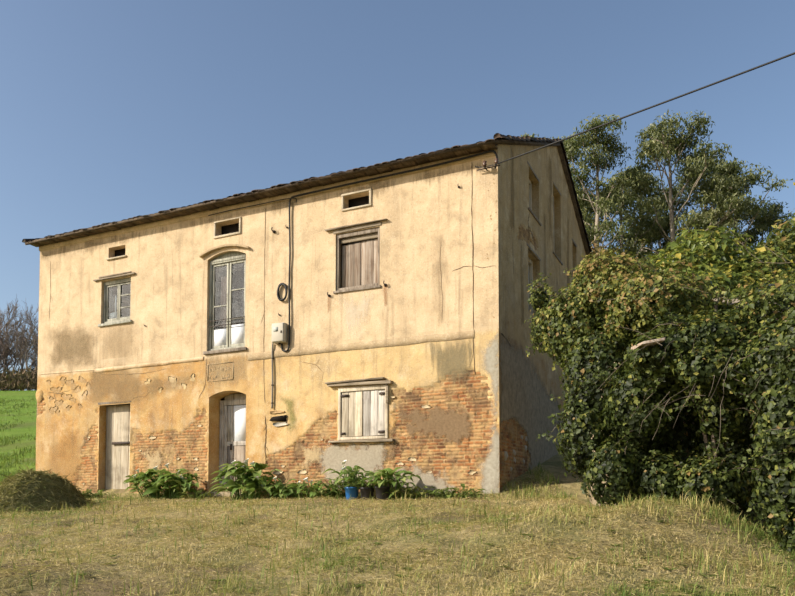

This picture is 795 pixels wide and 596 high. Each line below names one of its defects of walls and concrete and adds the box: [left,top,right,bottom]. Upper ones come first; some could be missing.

crack [440,167,490,373]
flaking render [38,376,92,416]
leakage [54,333,90,362]
flaking render [71,410,99,493]
flaking render [131,409,208,493]
flaking render [263,370,530,493]
leakage [432,344,471,379]